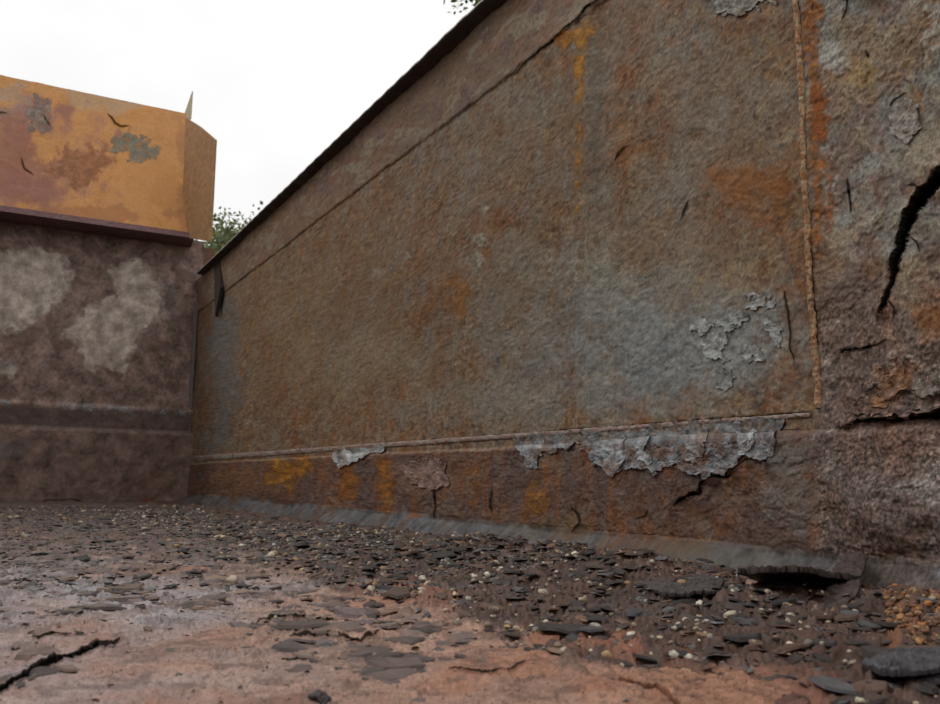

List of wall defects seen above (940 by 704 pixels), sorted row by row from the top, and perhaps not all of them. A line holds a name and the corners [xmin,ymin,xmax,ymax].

peeling [711,0,777,17]
rust [556,23,595,100]
rust [801,0,833,259]
crack [797,0,940,353]
damp [0,247,73,334]
damp [64,258,172,373]
peeling [689,290,783,392]
crack [783,290,795,362]
peeling [332,444,385,468]
peeling [512,416,785,480]
crack [846,408,940,426]
crack [0,630,120,694]